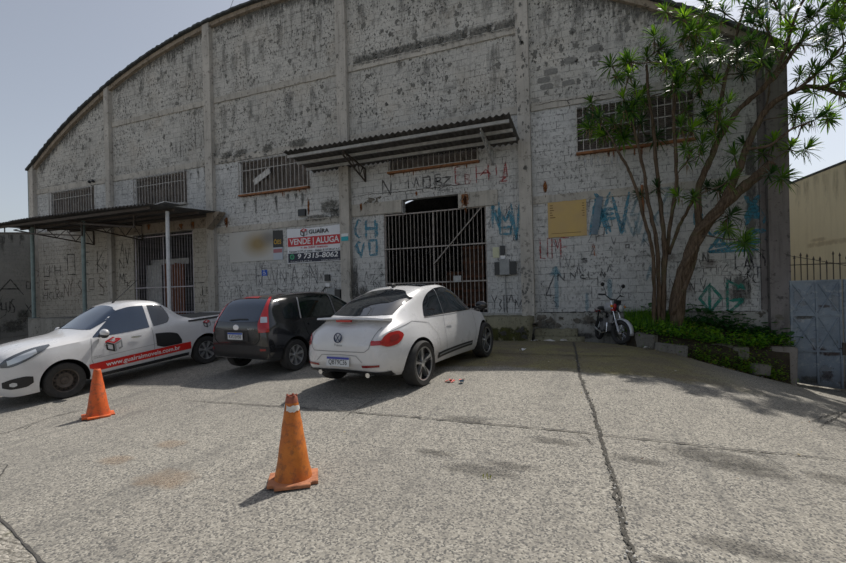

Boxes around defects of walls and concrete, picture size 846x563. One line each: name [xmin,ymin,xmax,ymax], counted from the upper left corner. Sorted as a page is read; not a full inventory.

leakage [353,15,516,66]